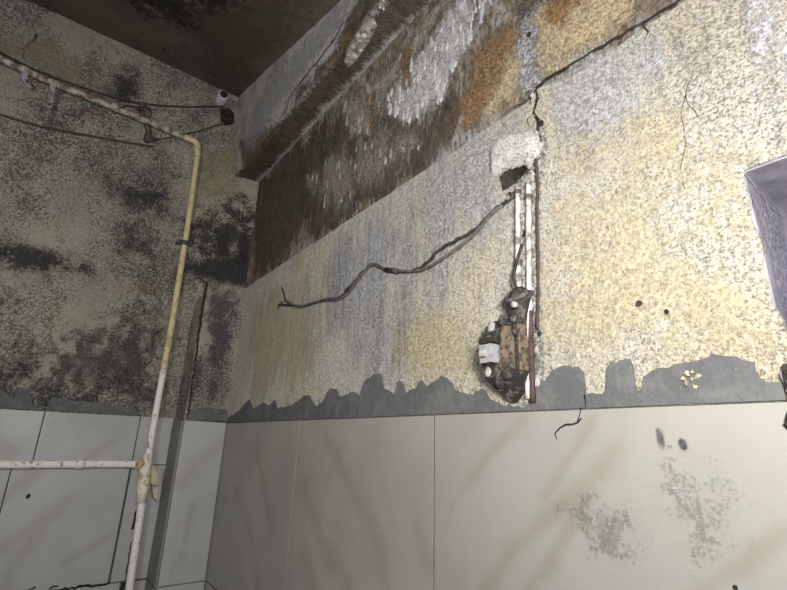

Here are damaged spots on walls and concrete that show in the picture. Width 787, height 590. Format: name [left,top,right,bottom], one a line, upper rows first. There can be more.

crack [502,0,681,156]
leakage [0,238,96,277]
leakage [100,175,169,216]
leakage [177,0,501,403]
flaking render [499,108,548,388]
peeling [680,370,702,389]